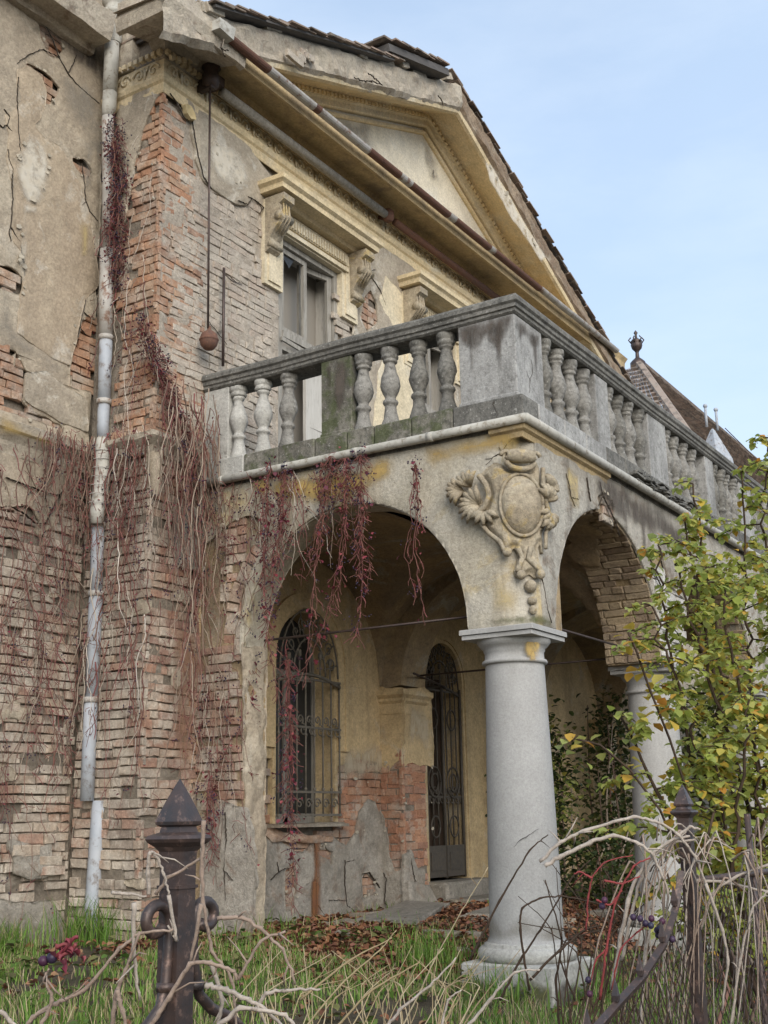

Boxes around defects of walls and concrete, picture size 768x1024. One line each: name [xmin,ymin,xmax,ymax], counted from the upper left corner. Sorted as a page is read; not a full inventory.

spalling [26,64,58,104]
crack [354,73,383,86]
crack [0,28,99,275]
peeling [211,143,246,186]
spalling [0,224,28,296]
spalling [111,92,211,442]
spalling [0,345,62,432]
spalling [70,314,97,396]
spalling [598,490,613,527]
crack [270,843,387,915]